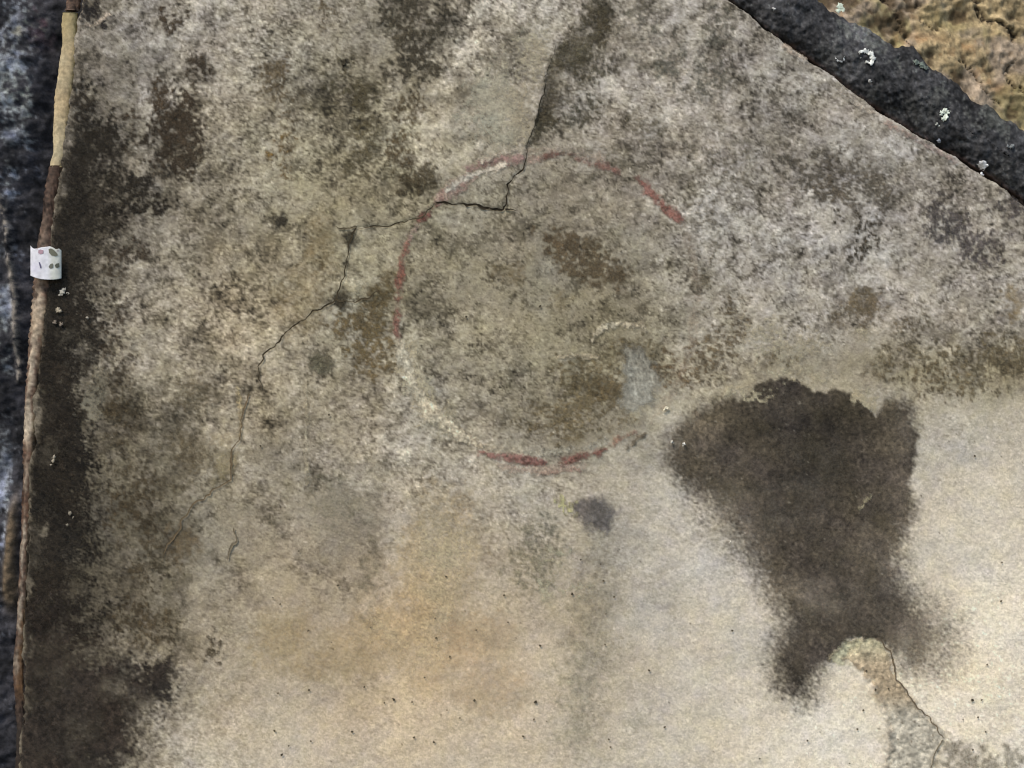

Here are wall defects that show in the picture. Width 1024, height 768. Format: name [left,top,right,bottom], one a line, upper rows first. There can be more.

leakage [158,5,190,37]
leakage [20,53,214,768]
crack [162,46,556,562]
leakage [667,313,1024,705]
leakage [828,286,889,330]
crack [877,638,944,768]